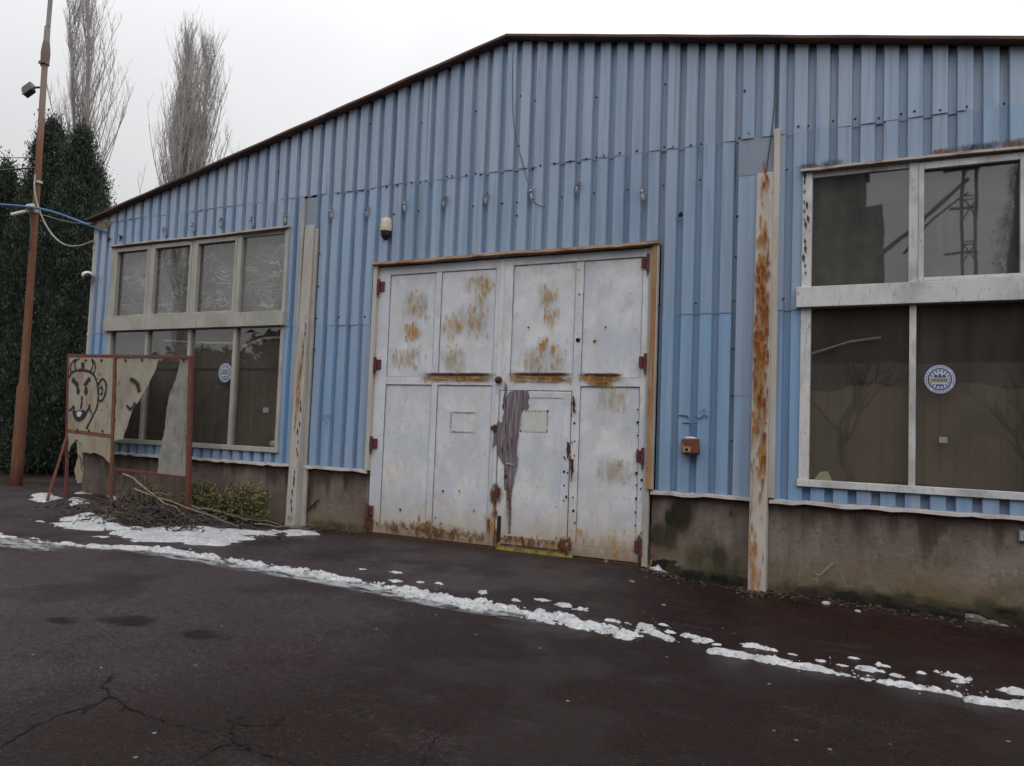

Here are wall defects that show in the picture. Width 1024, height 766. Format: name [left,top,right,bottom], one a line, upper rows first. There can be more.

corrosion [393,276,494,382]
corrosion [511,285,627,411]
corrosion [749,162,770,591]
corrosion [364,484,594,556]
leakage [651,501,691,546]
leakage [667,548,743,586]